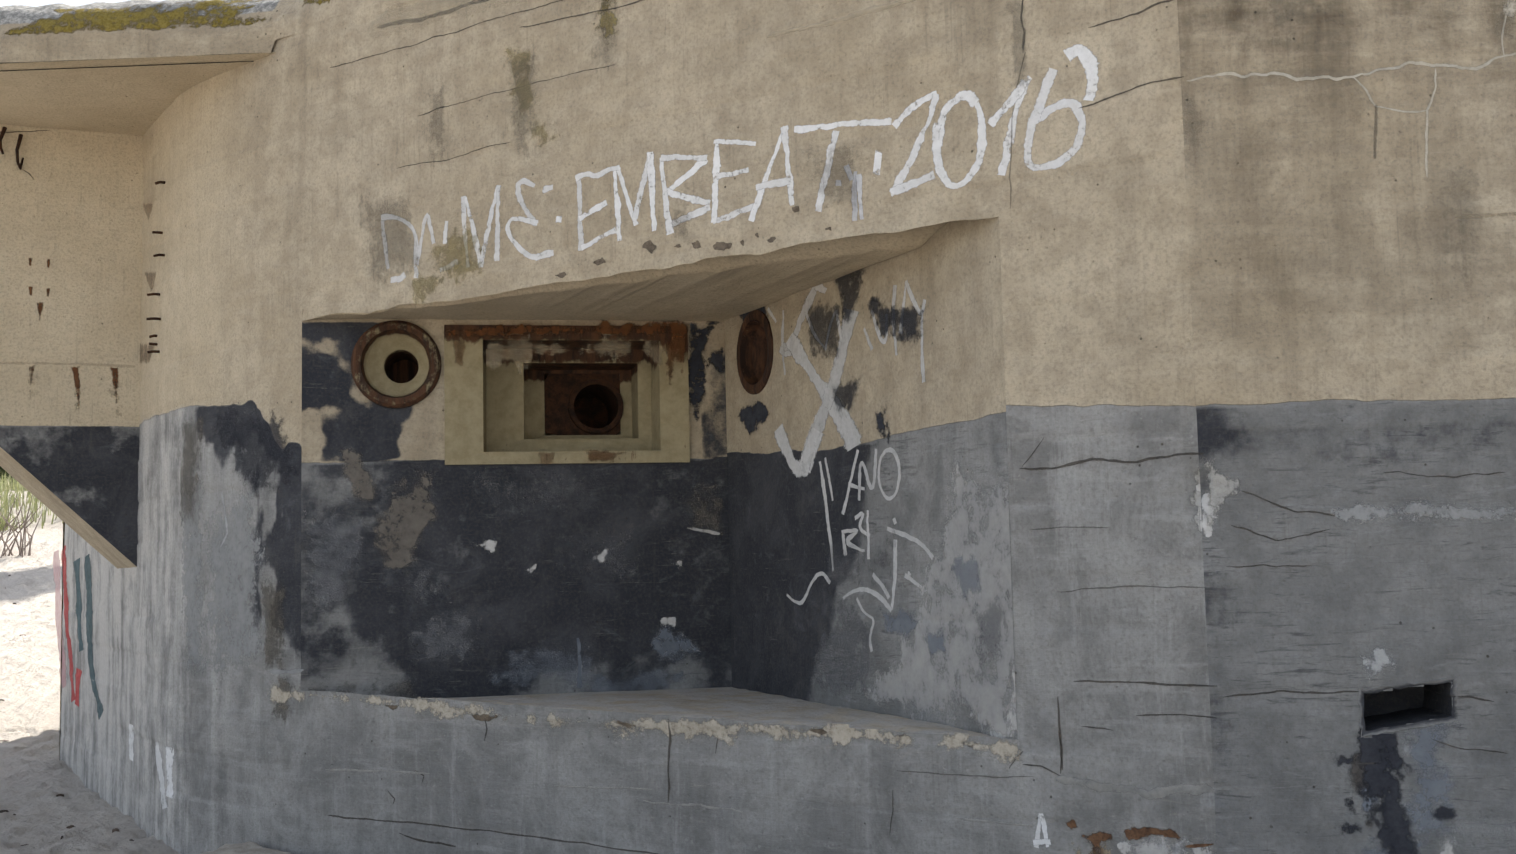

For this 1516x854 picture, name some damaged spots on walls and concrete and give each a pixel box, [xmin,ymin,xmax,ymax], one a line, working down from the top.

crack [330,0,643,68]
crack [1018,0,1026,53]
crack [419,64,615,116]
crack [1078,0,1516,177]
peeling [808,269,923,357]
corrosion [72,366,80,408]
corrosion [110,367,118,403]
corrosion [446,320,688,379]
peeling [688,321,725,421]
peeling [739,401,768,435]
spalling [1189,458,1239,537]
peeling [1338,728,1417,854]